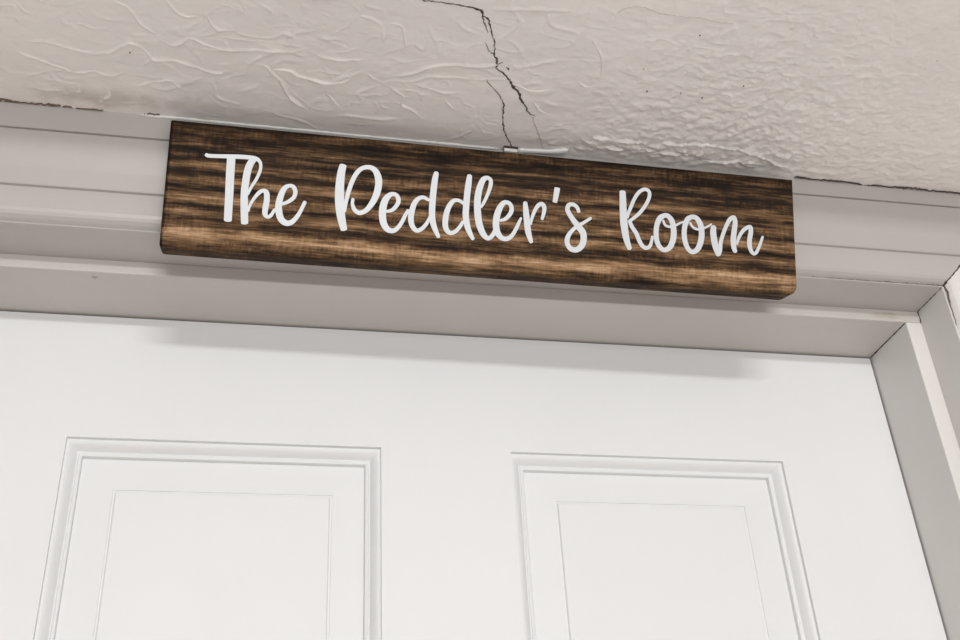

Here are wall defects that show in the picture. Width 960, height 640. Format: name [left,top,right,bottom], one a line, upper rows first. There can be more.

crack [423,0,543,146]